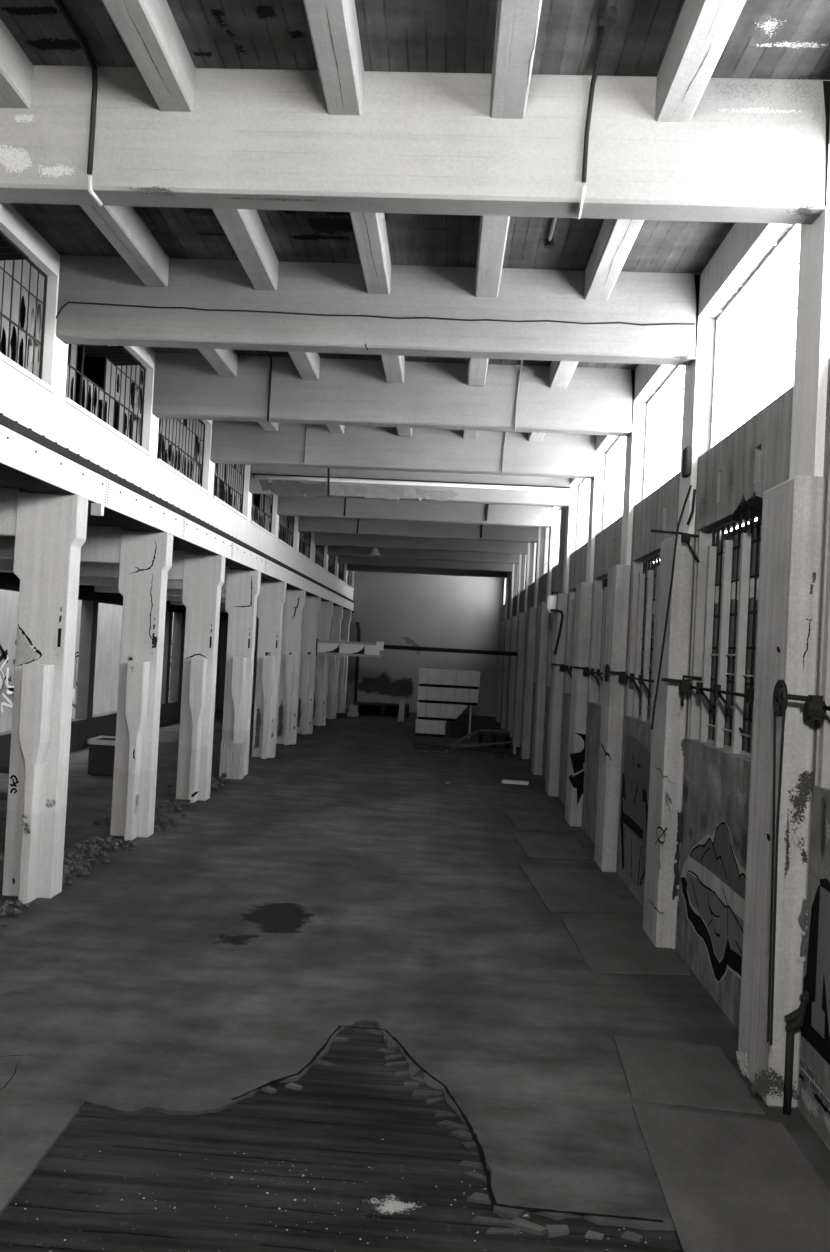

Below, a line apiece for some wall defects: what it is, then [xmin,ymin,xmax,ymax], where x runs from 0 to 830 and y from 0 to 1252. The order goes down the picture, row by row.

crack [128,542,157,639]